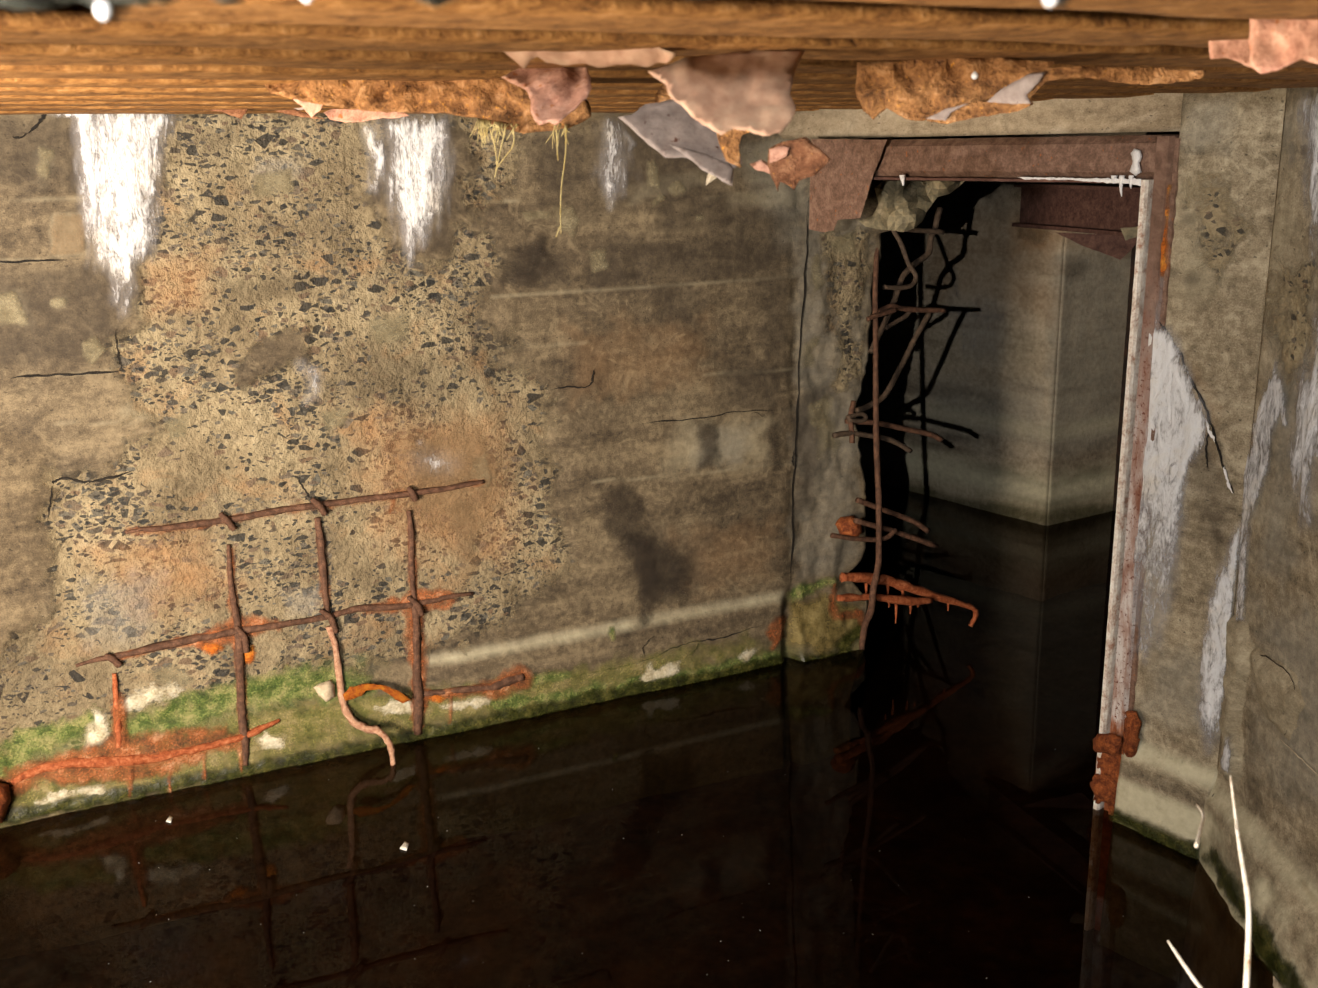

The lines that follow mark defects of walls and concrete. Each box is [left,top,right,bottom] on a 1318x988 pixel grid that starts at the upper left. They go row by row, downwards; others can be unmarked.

leakage [57,114,173,305]
leakage [364,116,447,258]
leakage [1303,93,1318,240]
leakage [1133,328,1206,650]
leakage [1199,318,1318,772]
corrosion [173,617,277,663]
corrosion [343,590,531,729]
corrosion [0,697,242,796]
corrosion [1095,735,1124,815]